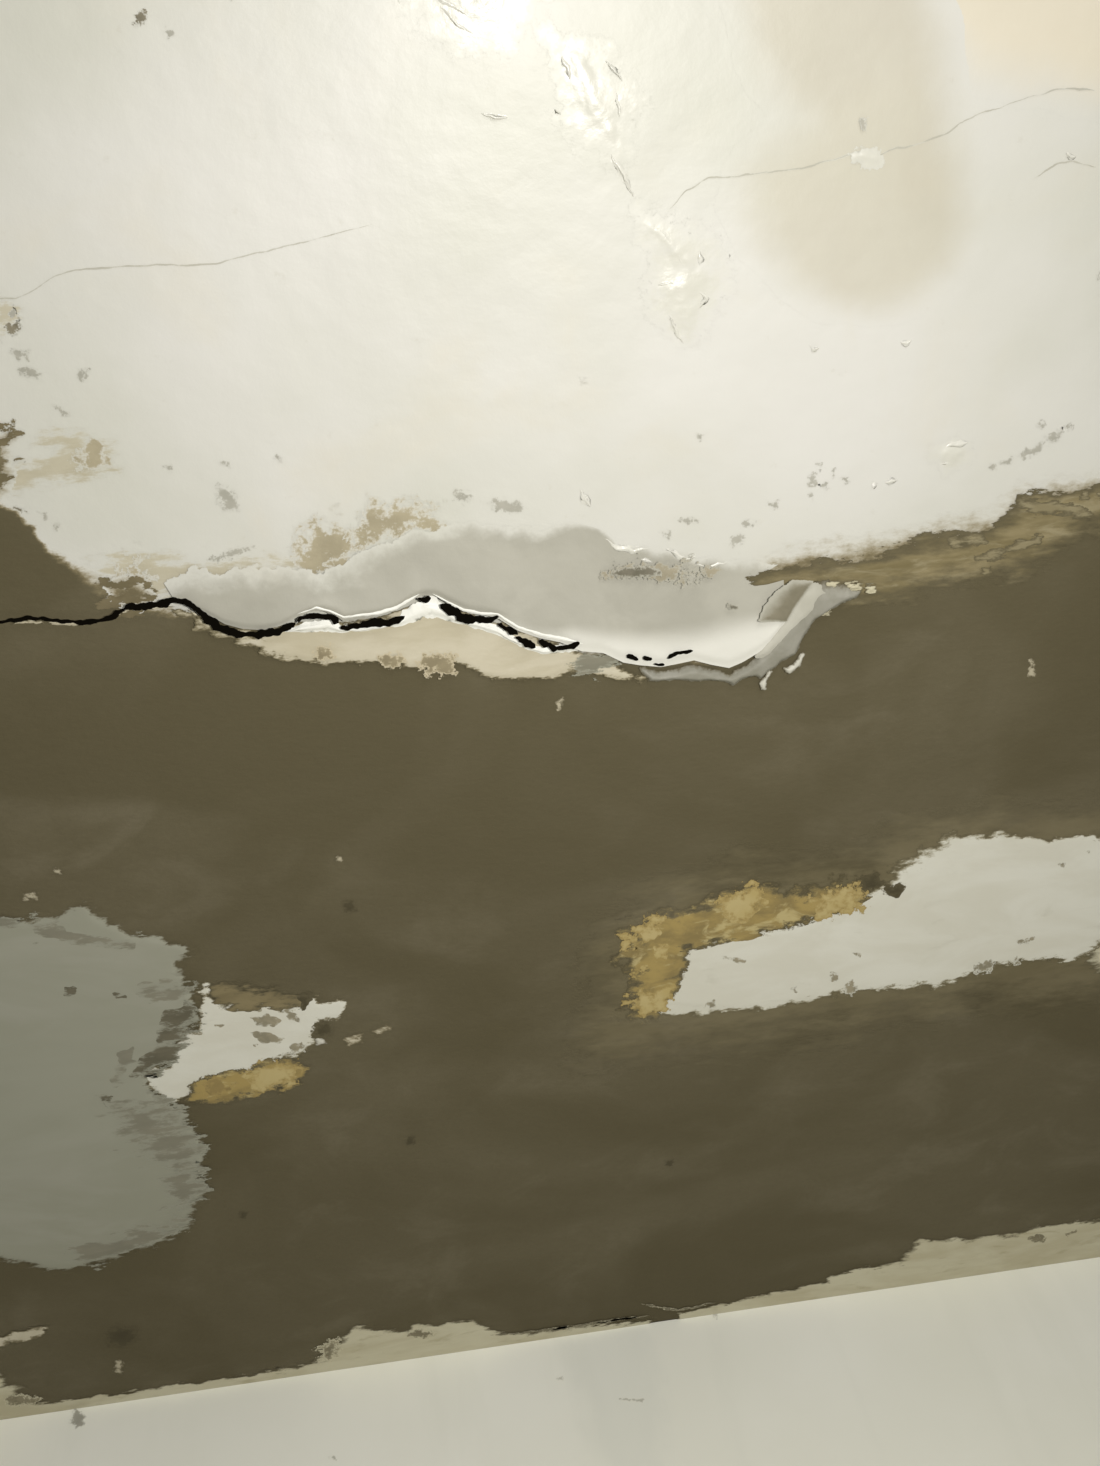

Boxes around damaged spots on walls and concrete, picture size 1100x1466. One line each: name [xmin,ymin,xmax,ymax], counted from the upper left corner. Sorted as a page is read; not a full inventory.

crack [670,88,1095,209]
leakage [713,0,1100,327]
crack [0,224,371,299]
peeling [0,296,43,382]
crack [0,596,580,652]
crack [627,650,693,666]
spalling [0,419,1100,1404]